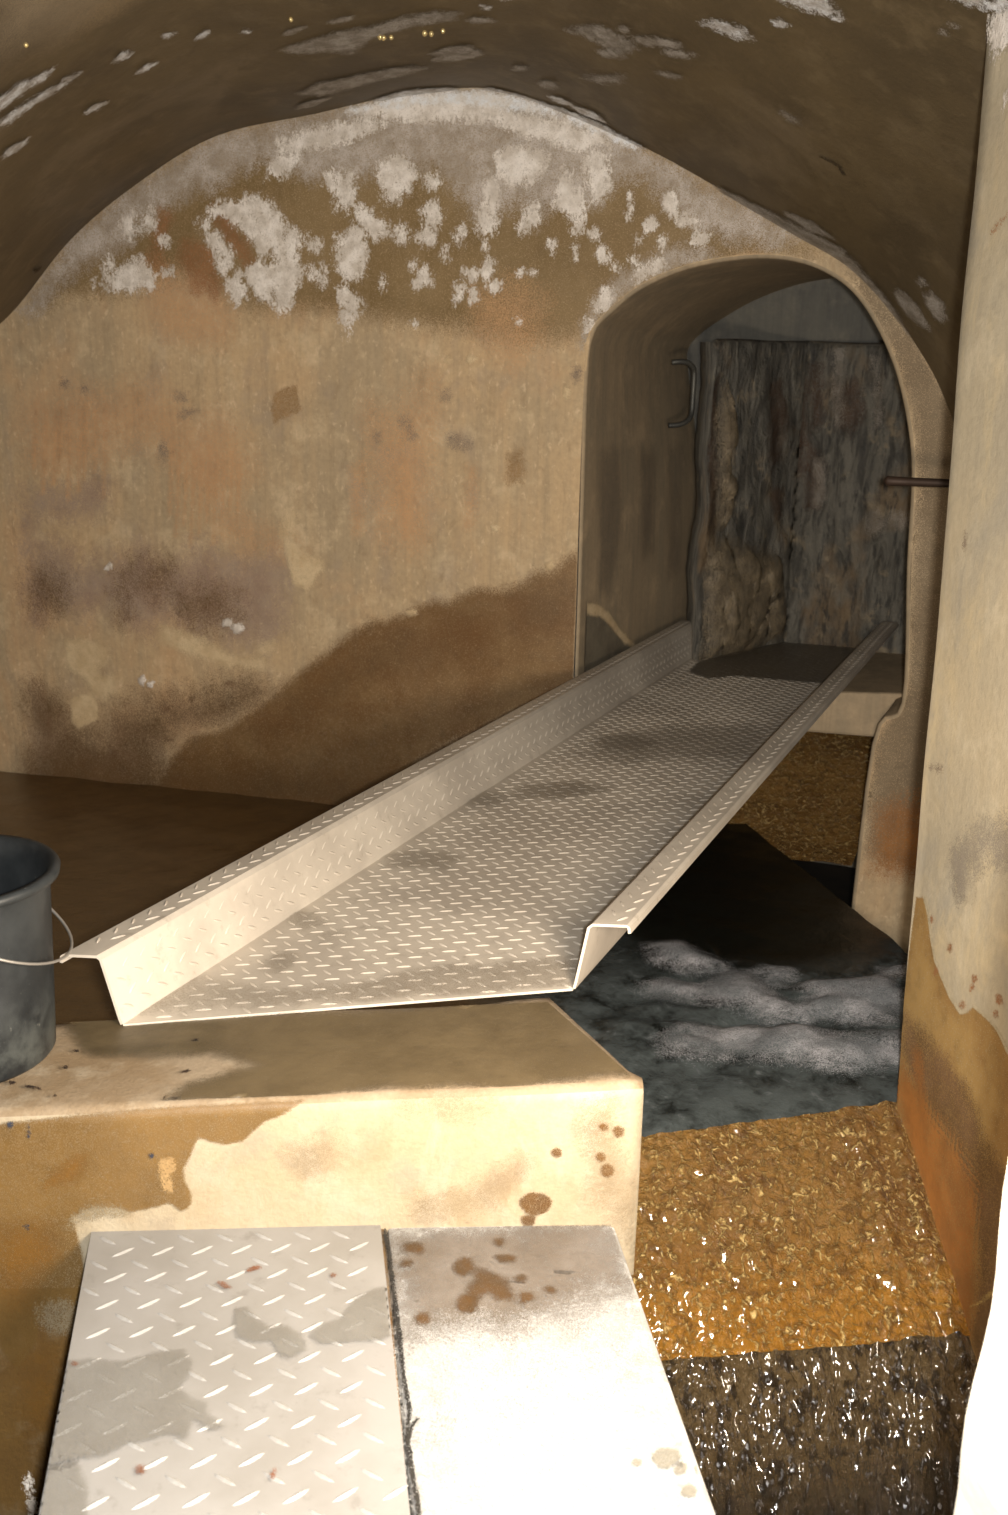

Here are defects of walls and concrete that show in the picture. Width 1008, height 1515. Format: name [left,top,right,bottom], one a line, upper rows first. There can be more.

damp [277,0,508,56]
damp [562,23,699,86]
damp [698,19,757,43]
damp [769,0,848,28]
damp [938,0,1008,65]
damp [10,44,954,874]
peeling [148,1153,177,1194]